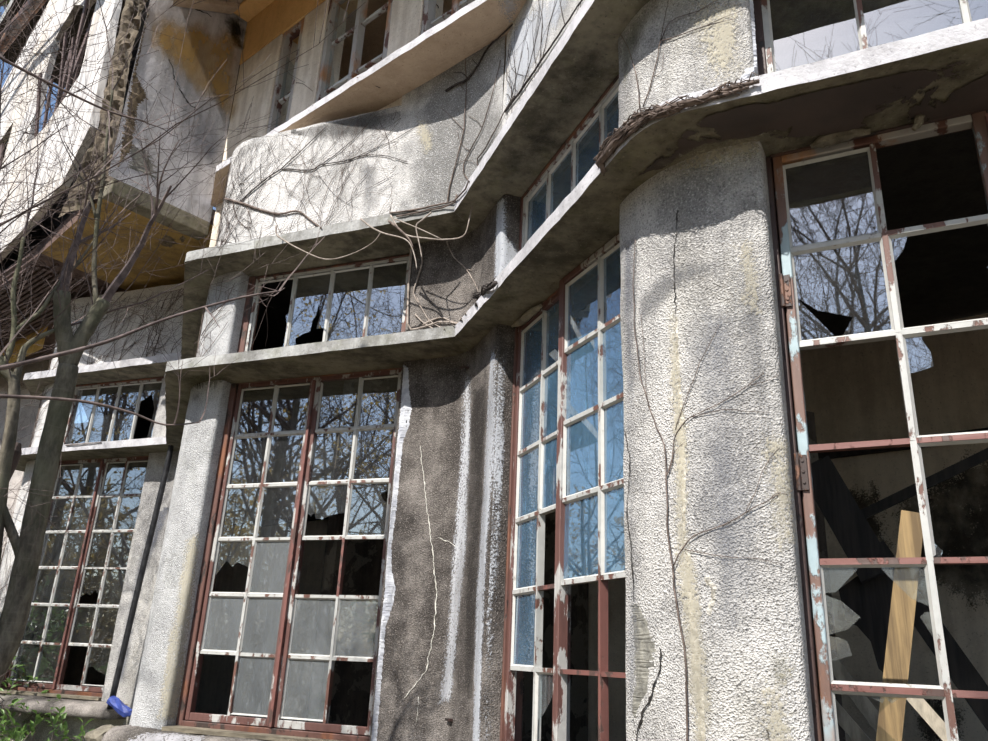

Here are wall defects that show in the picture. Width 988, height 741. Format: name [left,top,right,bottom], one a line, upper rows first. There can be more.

leakage [152,24,232,107]
leakage [331,112,377,137]
leakage [495,199,519,276]
crack [672,210,680,313]
leakage [439,378,472,703]
leakage [473,355,505,741]
crack [633,647,662,741]